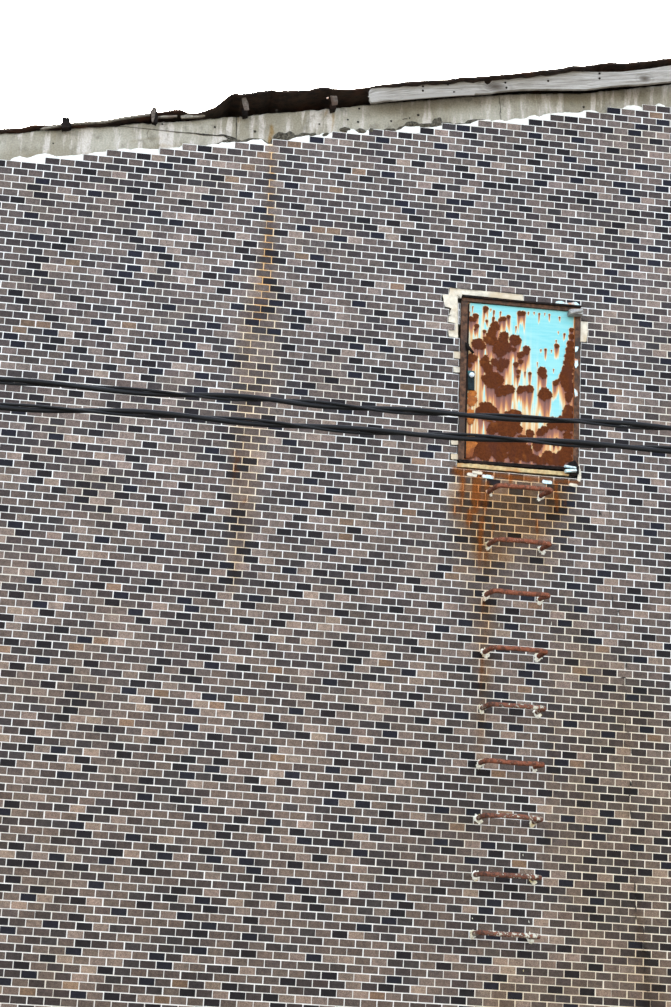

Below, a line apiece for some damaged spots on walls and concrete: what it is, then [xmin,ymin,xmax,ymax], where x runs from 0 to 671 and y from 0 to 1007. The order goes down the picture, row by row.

corrosion [464,306,574,479]